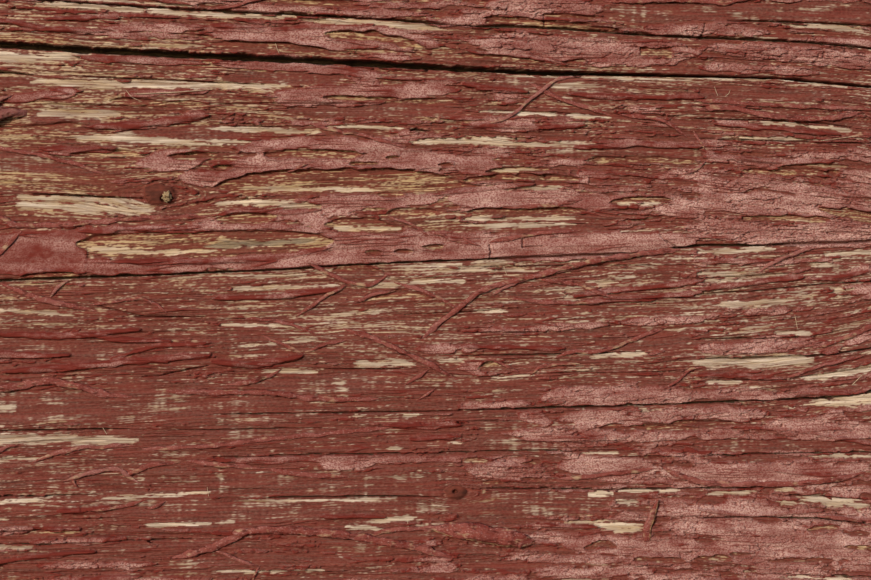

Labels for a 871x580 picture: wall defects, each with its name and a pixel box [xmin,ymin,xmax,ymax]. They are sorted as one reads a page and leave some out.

crack [0,42,871,88]
peeling [131,69,459,100]
peeling [73,133,209,147]
peeling [211,154,627,211]
peeling [0,192,871,276]
crack [667,241,783,249]
crack [0,258,503,282]
peeling [693,330,827,369]
peeling [540,385,769,422]
peeling [804,393,871,408]
peeling [0,431,138,446]
peeling [557,457,868,509]